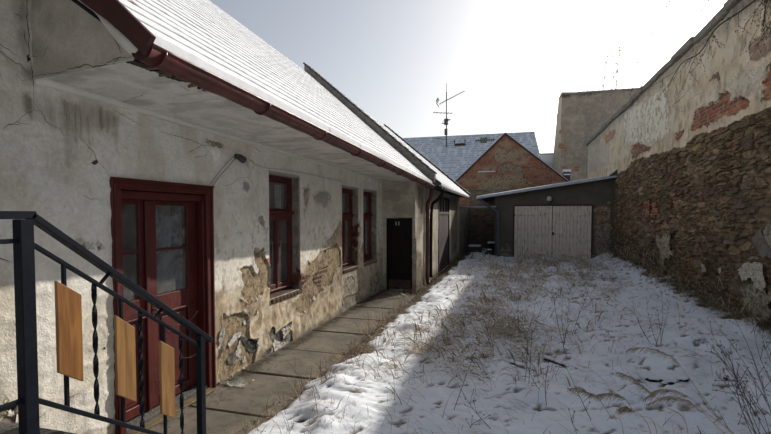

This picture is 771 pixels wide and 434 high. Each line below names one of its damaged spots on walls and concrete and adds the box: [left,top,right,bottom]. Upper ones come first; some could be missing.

crack [0,0,128,176]
spalling [631,142,652,160]
flaking render [675,91,750,141]
peeling [748,31,771,102]
spalling [217,220,342,383]